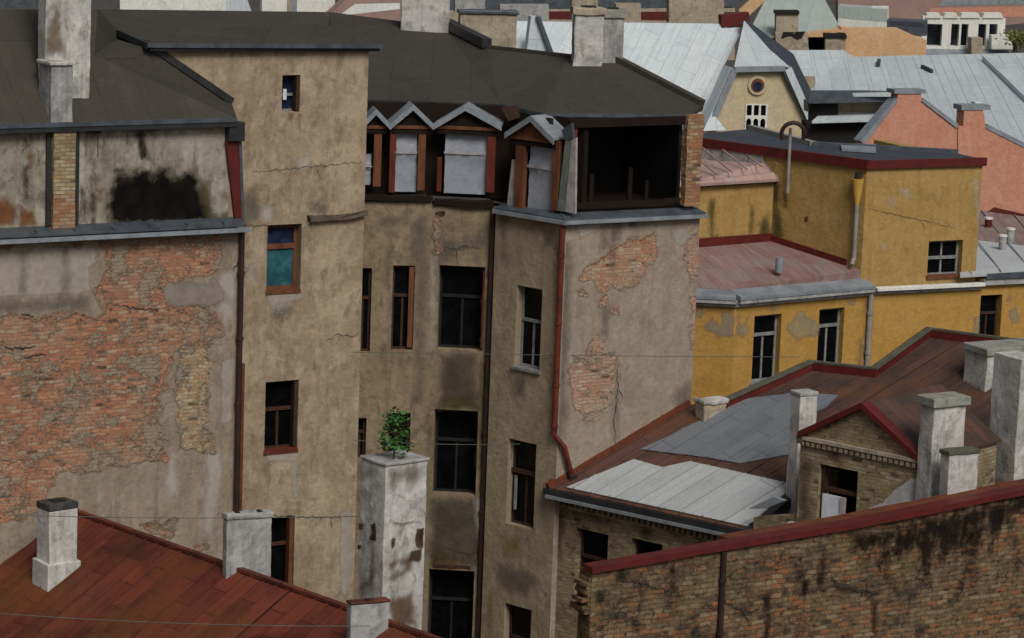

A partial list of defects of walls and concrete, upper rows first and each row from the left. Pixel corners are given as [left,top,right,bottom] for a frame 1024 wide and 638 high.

crack [257,162,358,177]
spalling [577,230,659,315]
peeling [787,310,820,339]
spalling [0,234,235,523]
spalling [567,333,619,423]
leakage [917,541,933,576]